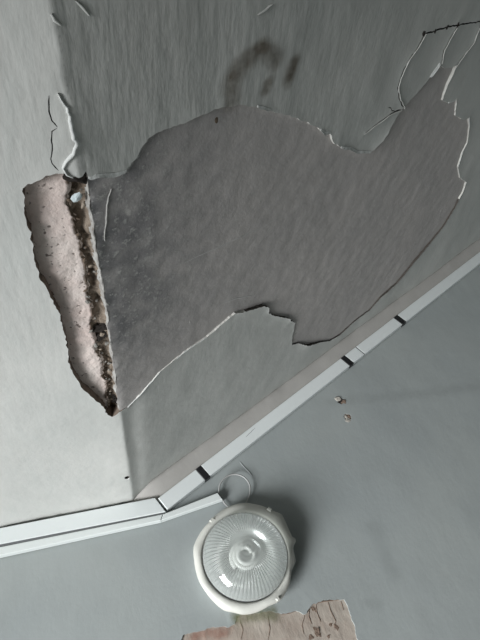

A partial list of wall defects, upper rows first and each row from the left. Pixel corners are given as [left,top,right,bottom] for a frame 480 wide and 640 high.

crack [364,22,480,135]
peeling [24,63,470,411]
flaking render [182,599,357,640]